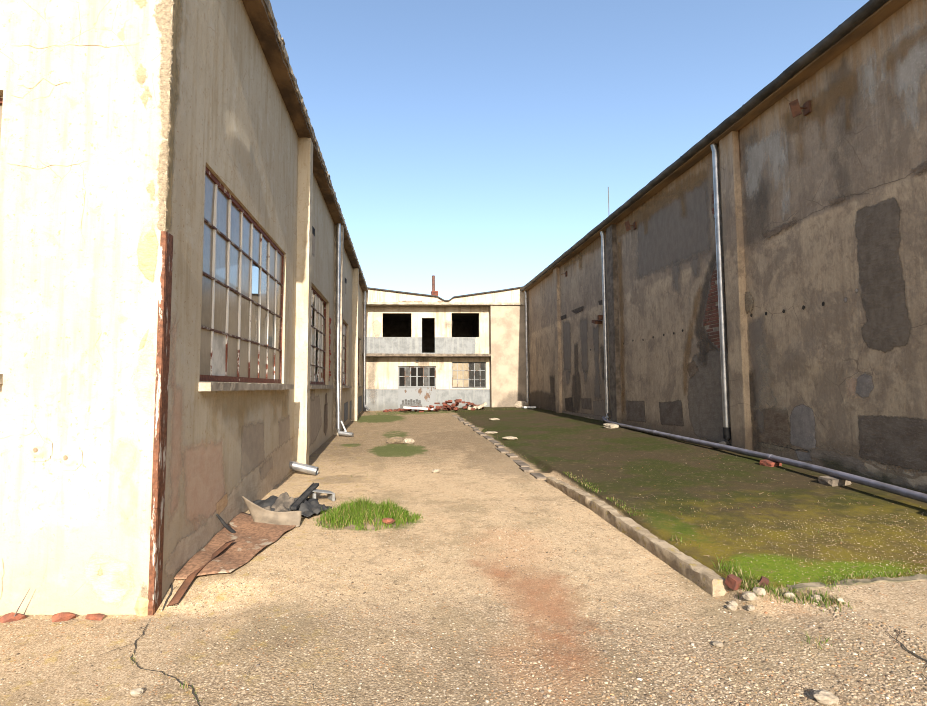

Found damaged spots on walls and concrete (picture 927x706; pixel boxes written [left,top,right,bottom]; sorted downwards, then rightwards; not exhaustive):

flaking render [134,0,174,282]
flaking render [702,256,728,351]